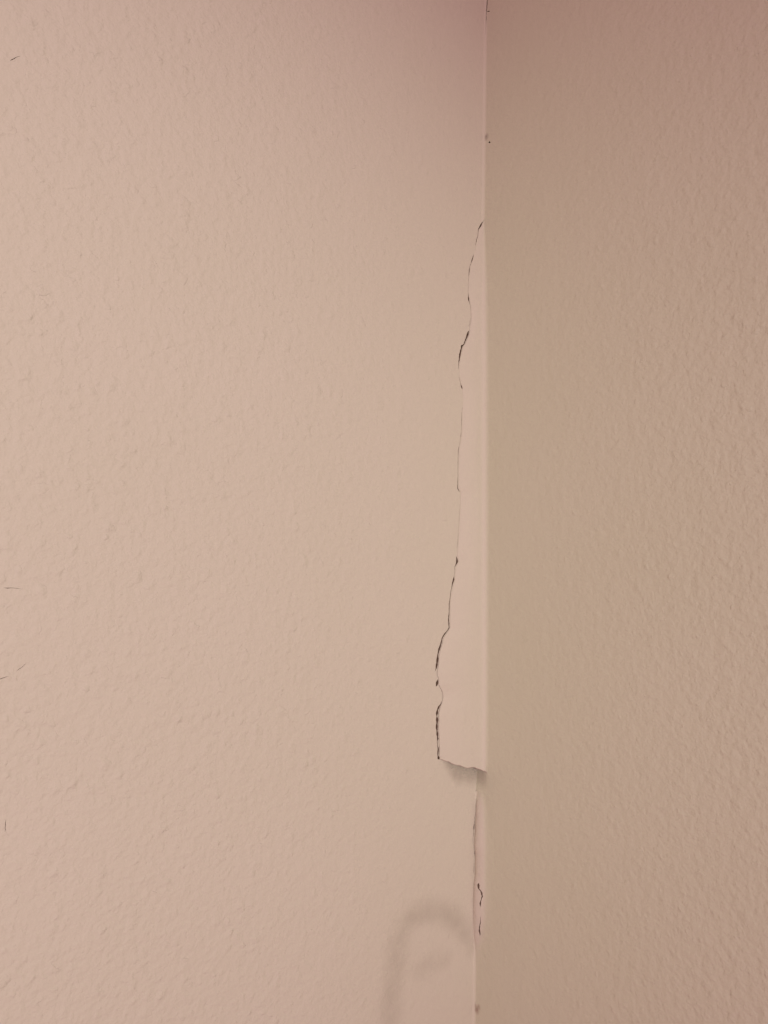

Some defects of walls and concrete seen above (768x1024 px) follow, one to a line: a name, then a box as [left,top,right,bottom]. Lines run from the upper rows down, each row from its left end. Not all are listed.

crack [435,481,460,759]